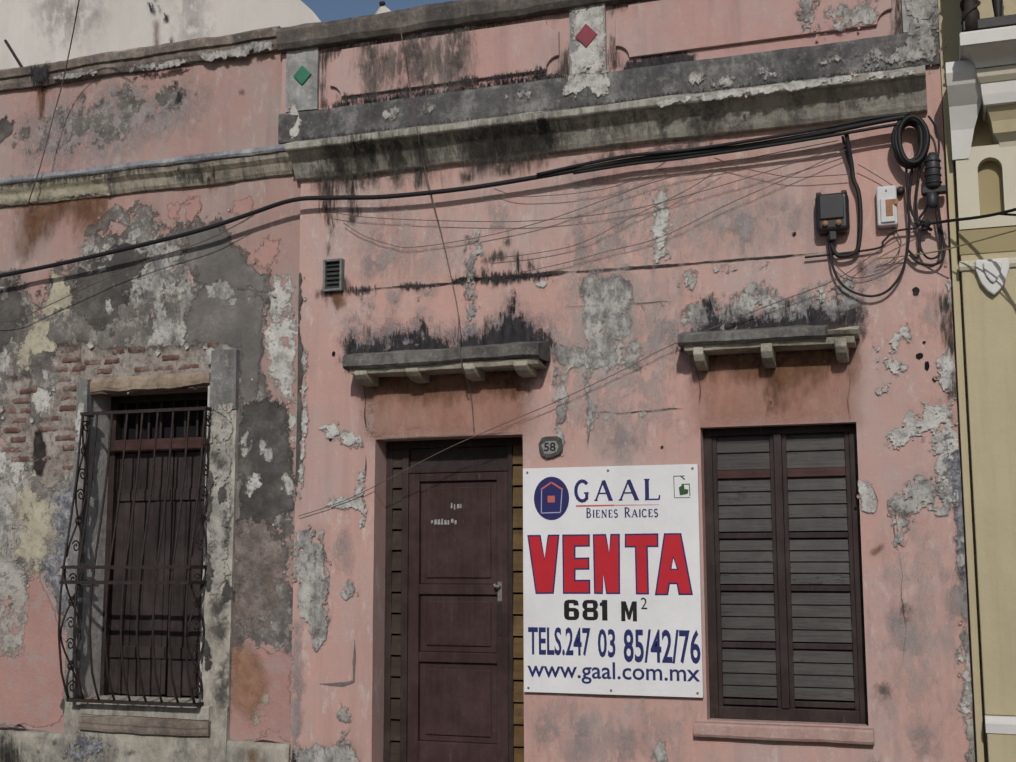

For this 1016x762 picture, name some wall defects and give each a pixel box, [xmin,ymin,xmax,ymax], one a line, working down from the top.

leakage [0,79,196,159]
leakage [319,21,570,109]
leakage [296,63,921,230]
peeling [656,0,947,108]
peeling [649,187,674,263]
leakage [317,278,377,306]
leakage [339,230,557,358]
leakage [679,263,867,336]
peeling [551,271,644,456]
peeling [871,322,913,395]
peeling [0,176,372,762]
peeling [856,348,975,762]